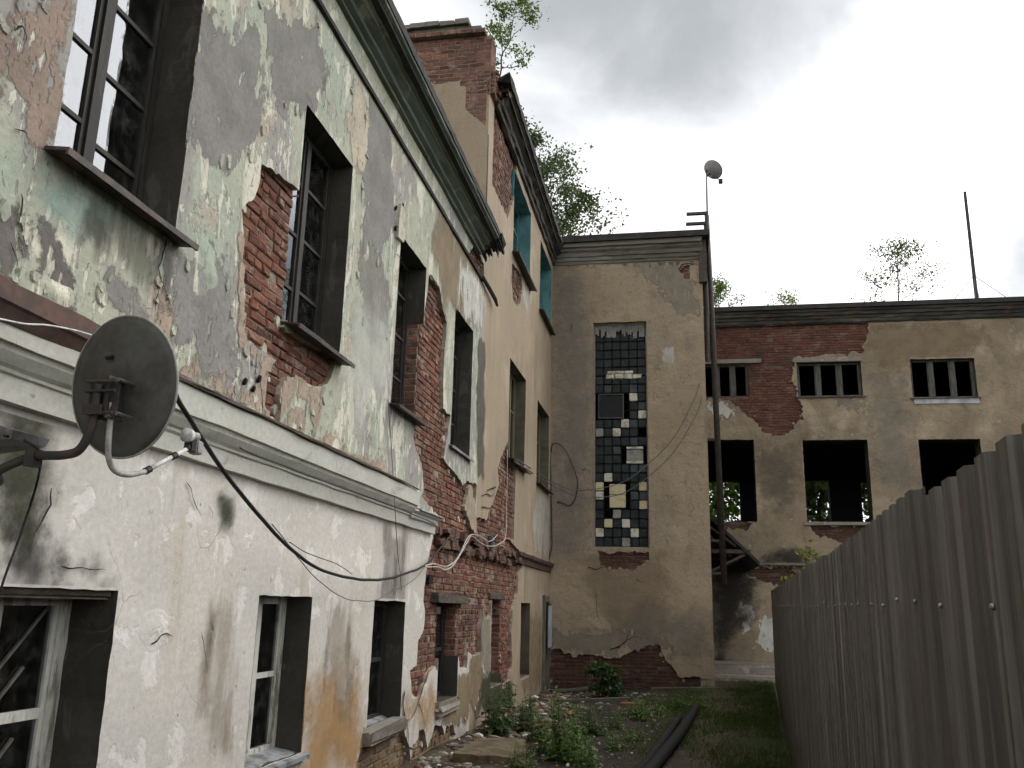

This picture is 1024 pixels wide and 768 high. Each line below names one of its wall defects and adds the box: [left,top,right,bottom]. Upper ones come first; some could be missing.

peeling [0,0,73,151]
spalling [95,0,384,470]
peeling [344,74,406,344]
spalling [412,35,514,213]
spalling [634,260,869,436]
spalling [356,281,520,768]
spalling [598,551,650,571]
spalling [550,627,701,689]
peeling [736,603,774,654]